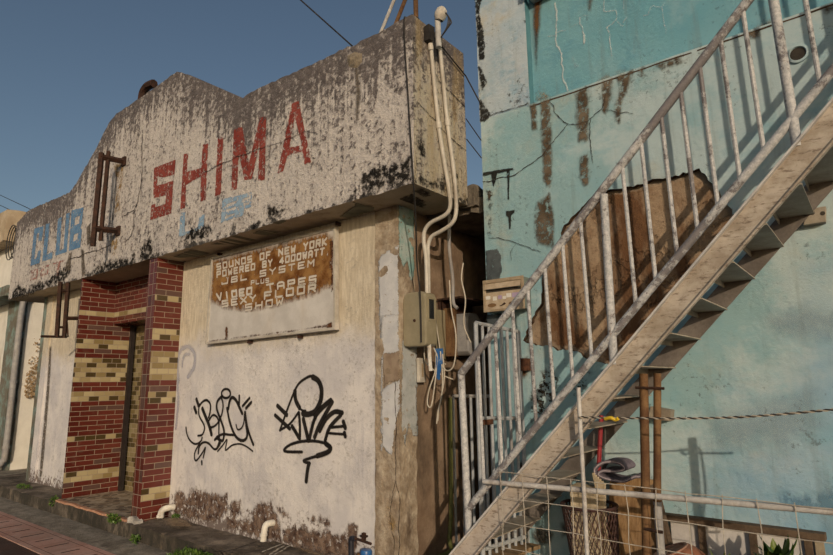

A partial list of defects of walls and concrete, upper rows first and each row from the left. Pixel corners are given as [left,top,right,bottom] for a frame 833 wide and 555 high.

crack [554,3,585,91]
damp [351,137,446,196]
crack [482,98,632,182]
damp [12,253,71,299]
damp [81,225,153,276]
damp [184,222,212,244]
damp [252,204,284,229]
spalling [527,171,733,364]
peeling [378,189,430,455]
damp [530,371,558,421]